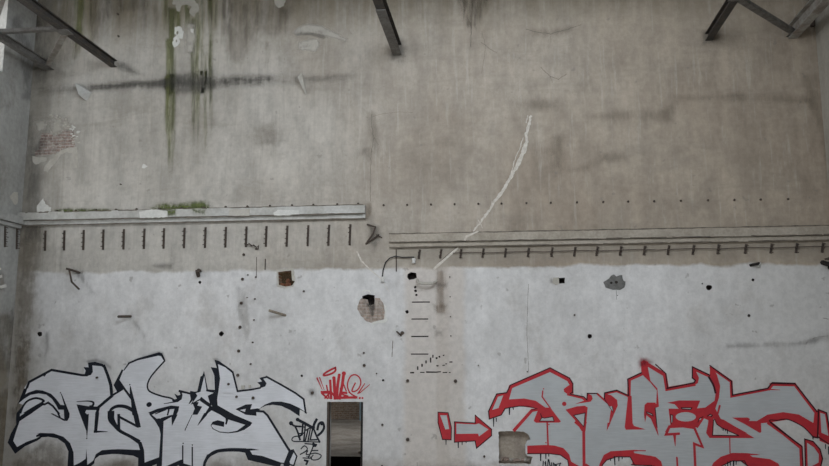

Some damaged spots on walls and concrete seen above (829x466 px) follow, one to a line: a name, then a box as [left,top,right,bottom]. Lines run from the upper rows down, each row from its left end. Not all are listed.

peeling [172,0,199,52]
leakage [165,0,199,128]
spalling [32,114,80,172]
crack [433,115,532,270]
spalling [276,268,295,288]
spalling [357,289,388,324]
spalling [498,431,533,464]